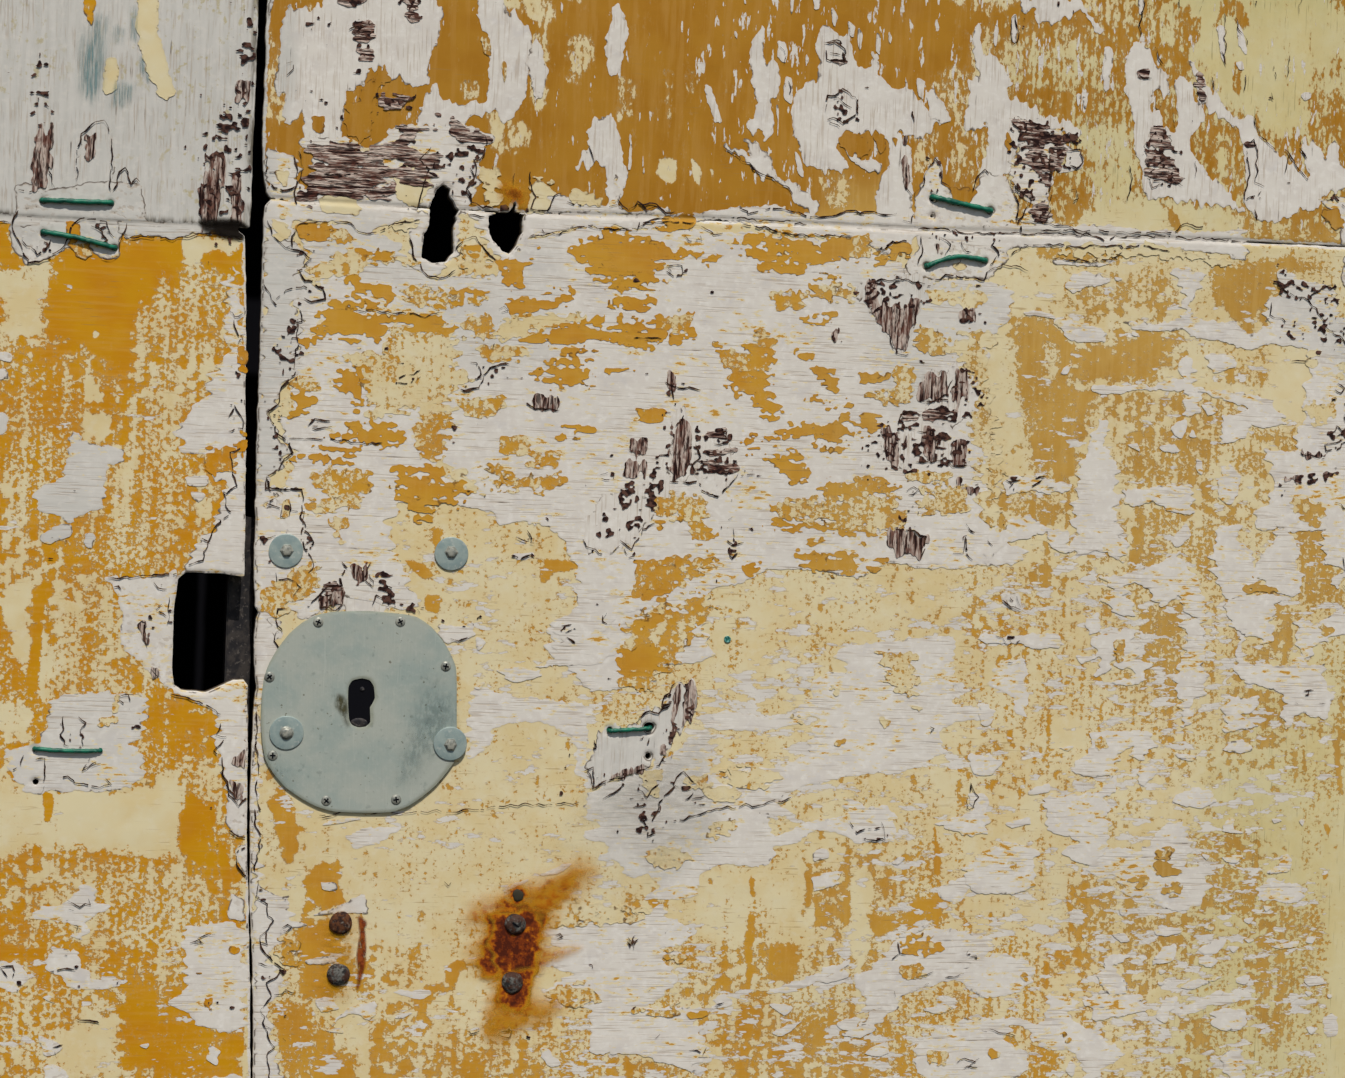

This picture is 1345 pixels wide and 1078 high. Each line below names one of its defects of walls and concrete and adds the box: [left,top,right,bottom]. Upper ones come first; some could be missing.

peeling [1011,0,1104,45]
peeling [1124,42,1345,246]
peeling [0,181,212,265]
peeling [1091,355,1287,453]
peeling [32,431,124,559]
peeling [168,8,1250,1078]
peeling [1121,256,1345,729]
peeling [3,690,149,795]
peeling [0,960,30,993]
peeling [29,885,127,990]
corrosion [357,917,367,988]
corrosion [471,868,585,1031]